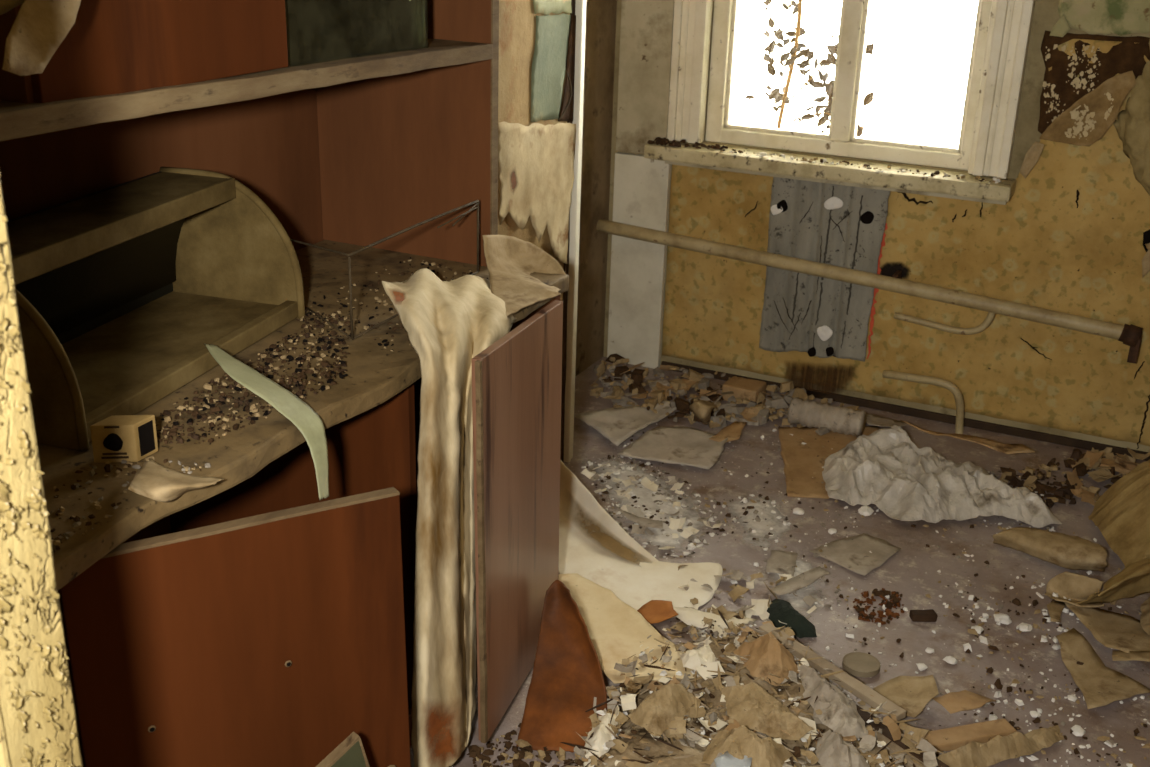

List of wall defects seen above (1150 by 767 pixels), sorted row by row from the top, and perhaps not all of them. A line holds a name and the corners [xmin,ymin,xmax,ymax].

crack [1134,361,1150,449]